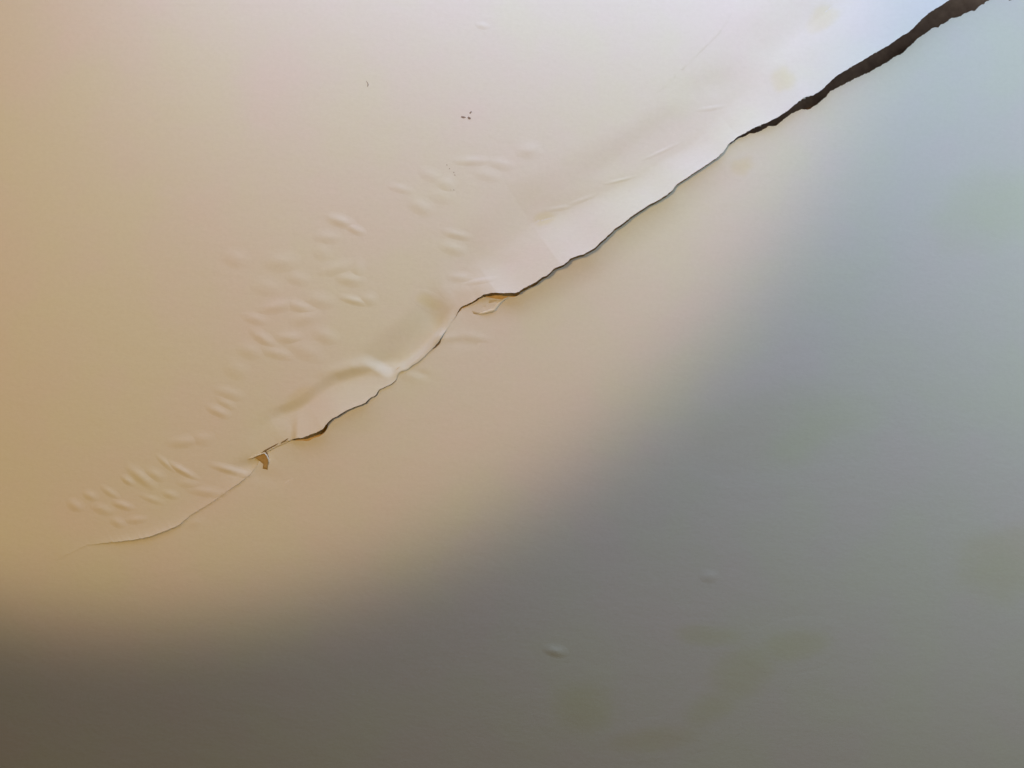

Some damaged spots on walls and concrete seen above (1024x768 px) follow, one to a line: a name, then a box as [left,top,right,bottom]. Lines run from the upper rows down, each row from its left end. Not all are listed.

peeling [420,0,949,315]
peeling [227,339,382,473]